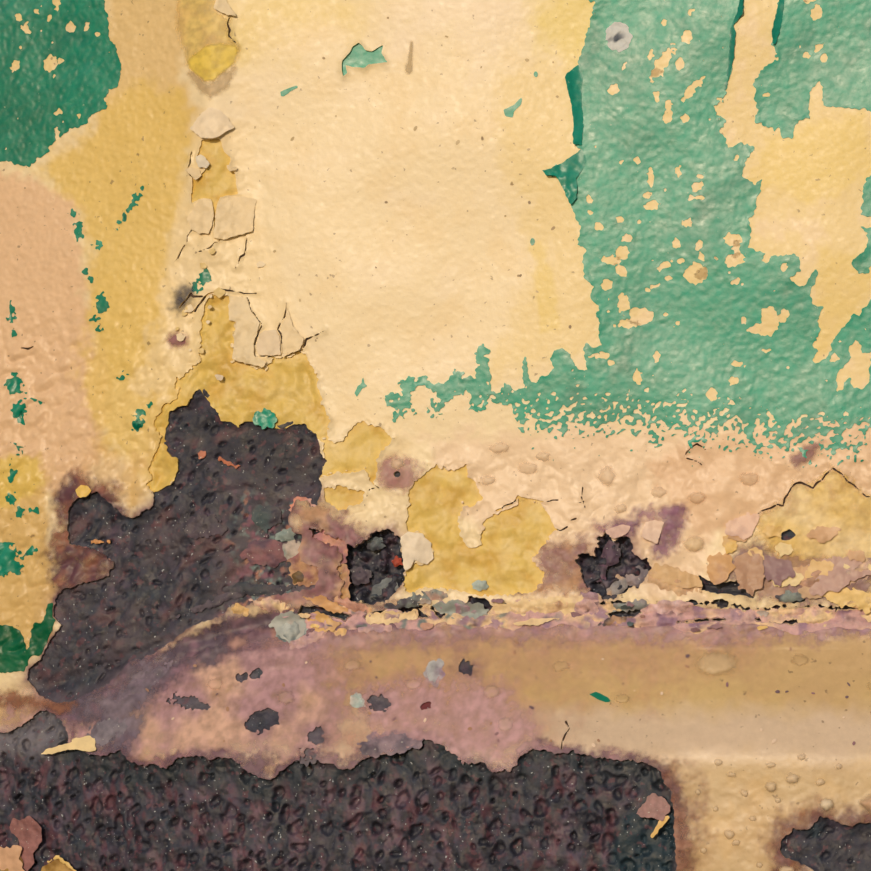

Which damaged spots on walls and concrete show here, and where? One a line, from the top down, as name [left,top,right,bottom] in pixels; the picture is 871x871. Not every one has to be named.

spalling [15,0,61,34]
spalling [65,21,100,37]
spalling [43,54,64,78]
peeling [645,0,871,391]
spalling [601,234,680,329]
crack [180,289,286,357]
peeling [400,464,557,604]
peeling [755,470,871,561]
crack [758,468,871,514]
peeling [41,736,96,754]
peeling [636,793,670,838]
peeling [0,816,77,871]